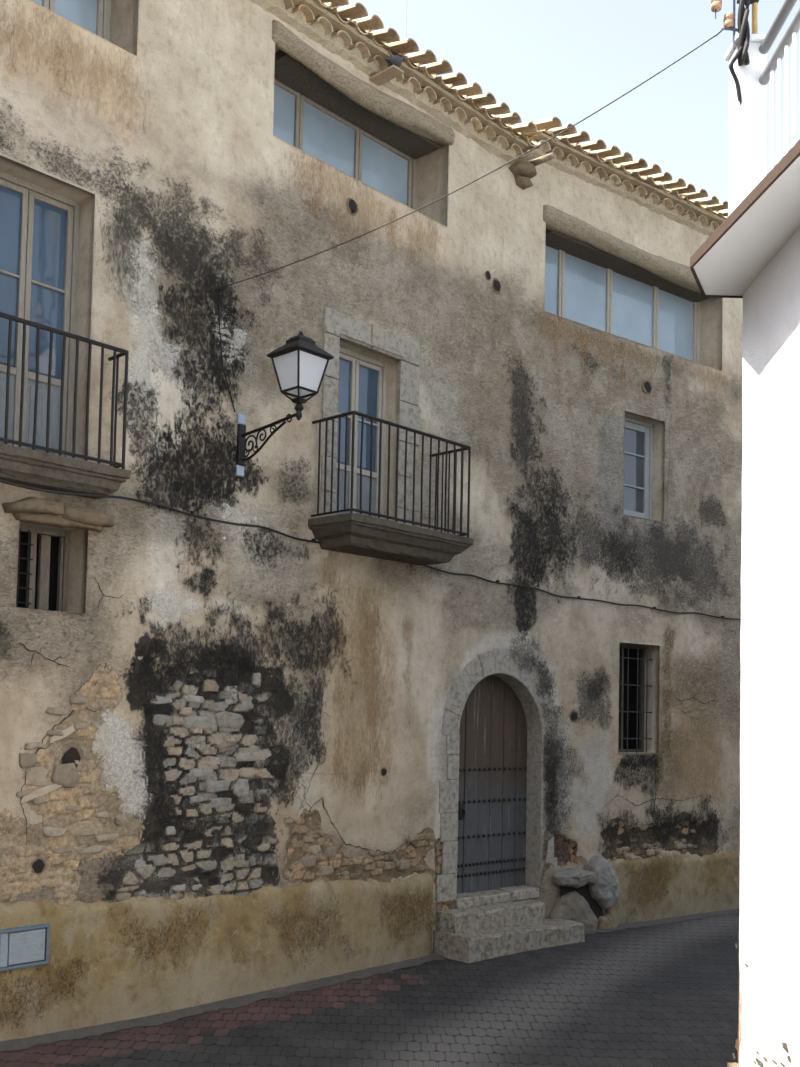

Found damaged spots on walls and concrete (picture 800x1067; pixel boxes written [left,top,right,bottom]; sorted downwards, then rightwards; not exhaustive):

damp [94,183,351,970]
damp [506,358,578,640]
damp [698,497,727,527]
spalling [0,632,456,911]
spalling [601,812,719,861]
damp [0,959,89,1028]